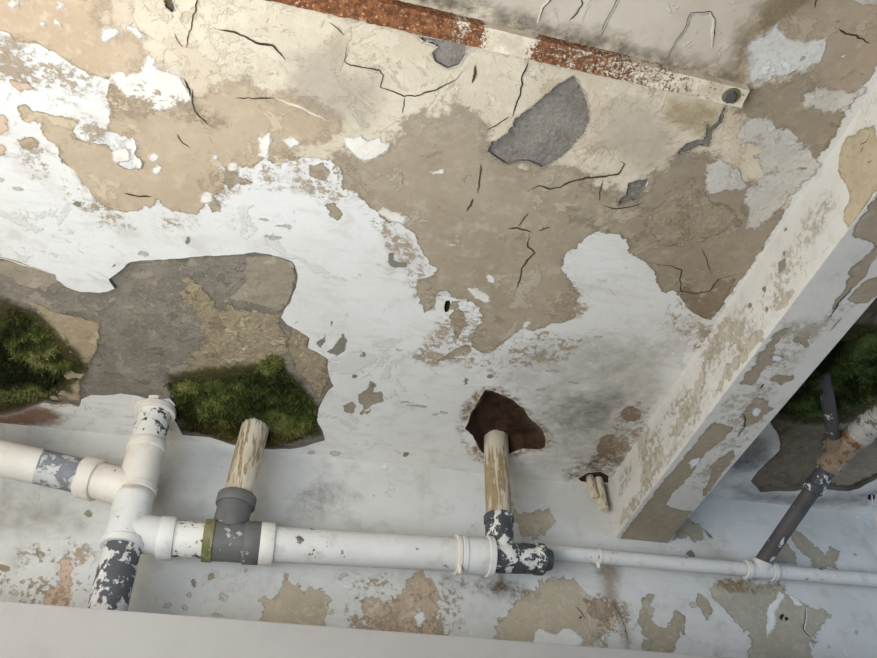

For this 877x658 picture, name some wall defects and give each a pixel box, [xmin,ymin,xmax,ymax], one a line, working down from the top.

crack [329,22,476,114]
crack [486,60,529,131]
crack [667,11,715,57]
peeling [0,0,877,368]
crack [467,164,482,211]
crack [528,161,643,209]
crack [509,214,550,290]
flaking render [0,251,347,454]
spalling [465,390,546,454]
peeling [620,317,832,543]
peeling [338,570,461,636]
peeling [493,575,832,658]